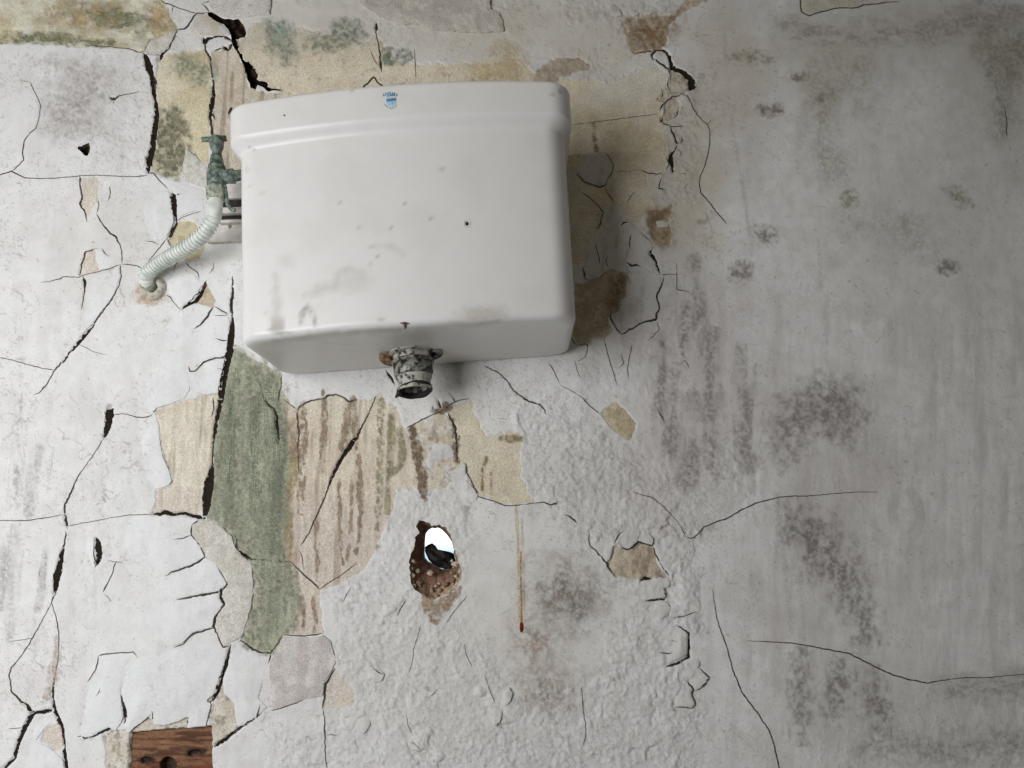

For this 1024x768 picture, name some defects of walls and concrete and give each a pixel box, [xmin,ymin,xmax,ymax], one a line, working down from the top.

flaking render [0,0,178,52]
spalling [78,143,90,156]
flaking render [144,12,689,346]
crack [549,50,726,413]
crack [0,0,335,768]
flaking render [79,244,534,768]
crack [234,366,780,768]
rust [515,508,523,633]
flaking render [590,530,670,619]
crack [634,492,855,539]
water stain [787,516,870,640]
crack [753,641,1024,684]